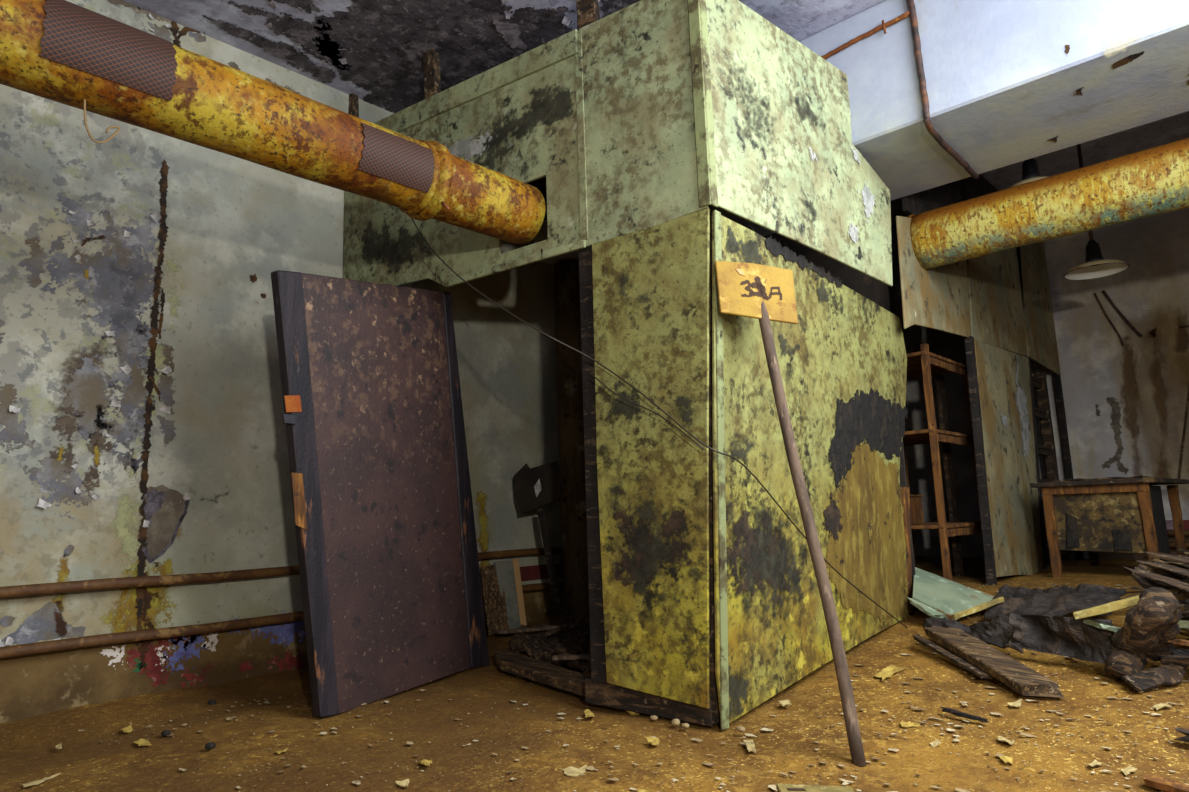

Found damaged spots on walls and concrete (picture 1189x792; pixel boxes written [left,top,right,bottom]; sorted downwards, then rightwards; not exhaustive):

flaking render [108,0,174,43]
peeling [203,0,576,113]
peeling [0,192,184,519]
flaking render [142,485,228,563]